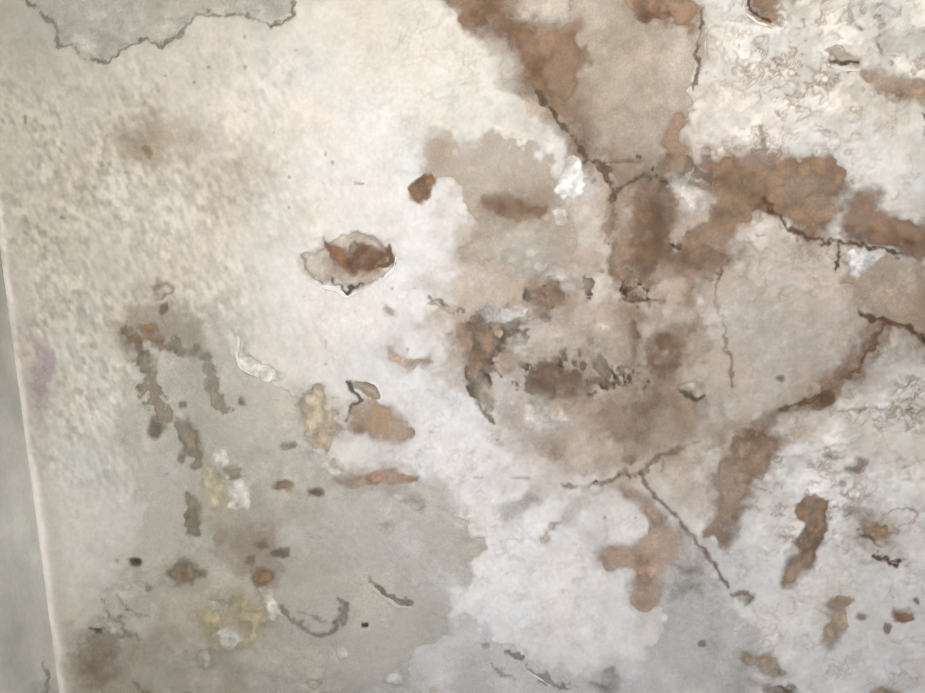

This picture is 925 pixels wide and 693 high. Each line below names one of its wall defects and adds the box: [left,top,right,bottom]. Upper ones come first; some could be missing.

spalling [743,0,780,29]
spalling [825,45,925,100]
crack [535,90,641,210]
spalling [302,231,397,299]
damp [408,0,925,545]
crack [763,197,903,270]
crack [852,312,925,373]
damp [184,492,200,536]
peeling [84,318,487,693]
damp [600,486,712,612]
crack [601,446,729,588]
damp [782,495,828,586]